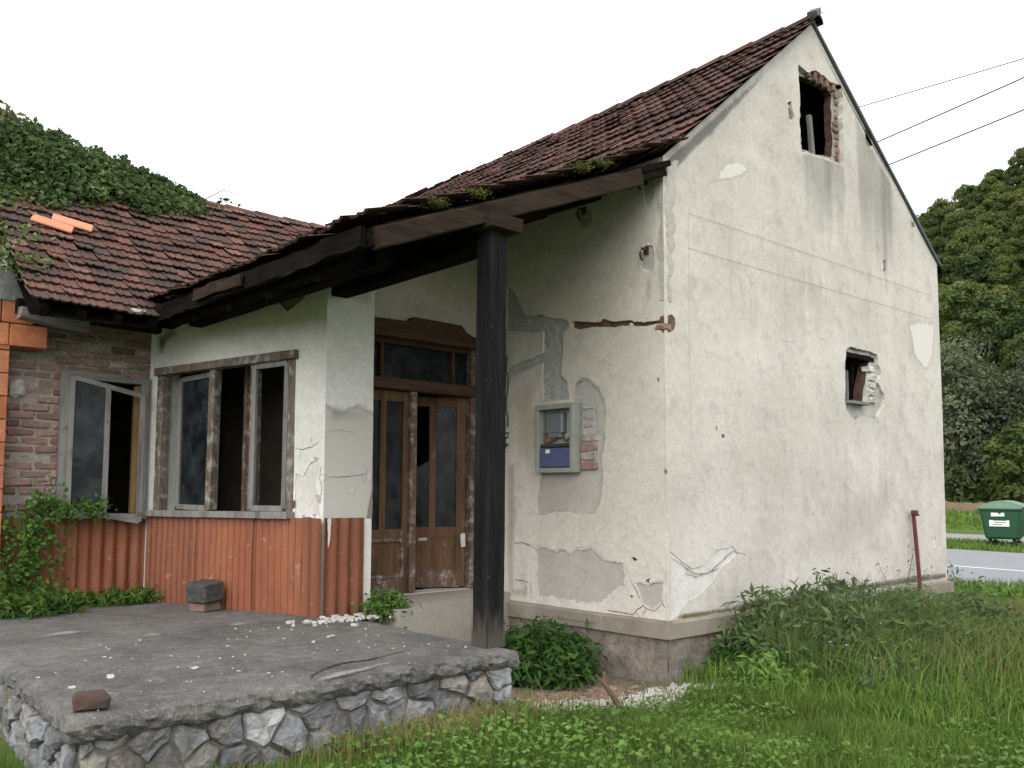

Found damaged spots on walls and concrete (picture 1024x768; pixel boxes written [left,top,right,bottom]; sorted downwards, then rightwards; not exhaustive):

flaking render [798,66,844,163]
flaking render [655,323,672,331]
peeling [910,320,934,368]
crack [295,429,369,498]
flaking render [538,377,606,515]
flaking render [531,543,737,619]